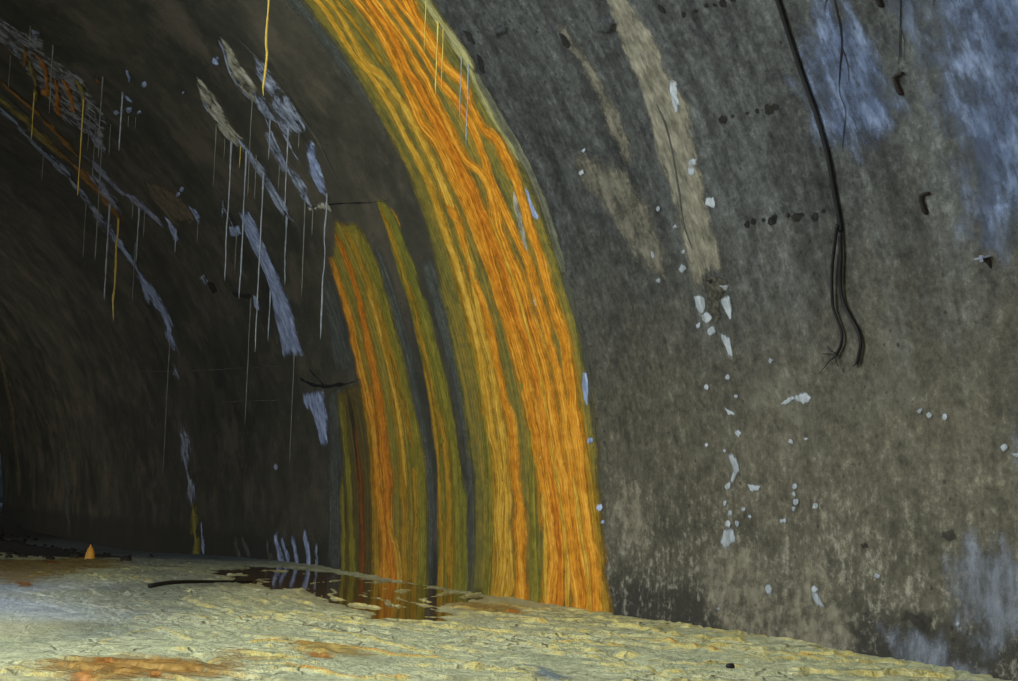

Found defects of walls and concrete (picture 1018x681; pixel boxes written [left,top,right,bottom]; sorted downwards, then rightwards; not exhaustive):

rust [23,46,86,117]
leakage [562,27,663,271]
crack [824,0,857,149]
leakage [807,1,899,142]
leakage [904,3,914,34]
leakage [942,0,1018,246]
leakage [0,19,351,567]
rust [304,0,610,614]